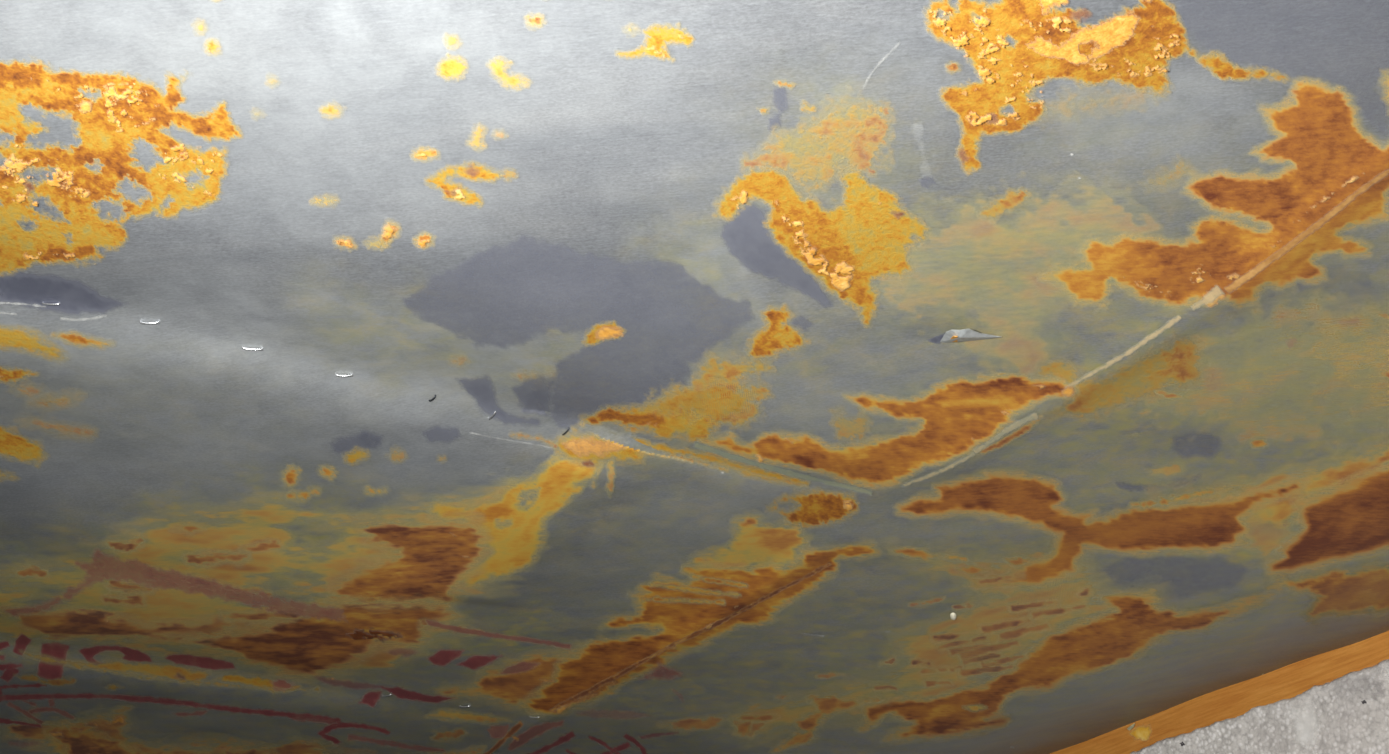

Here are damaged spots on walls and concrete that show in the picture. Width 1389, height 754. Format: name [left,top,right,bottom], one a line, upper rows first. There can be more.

rust [198,25,219,53]
rust [438,37,467,78]
rust [490,59,527,87]
rust [616,24,694,60]
rust [0,60,242,276]
rust [414,127,516,205]
rust [926,0,1389,307]
rust [336,223,399,248]
rust [414,233,431,248]
rust [715,103,929,326]
leakage [405,238,751,427]
rust [0,305,1389,754]